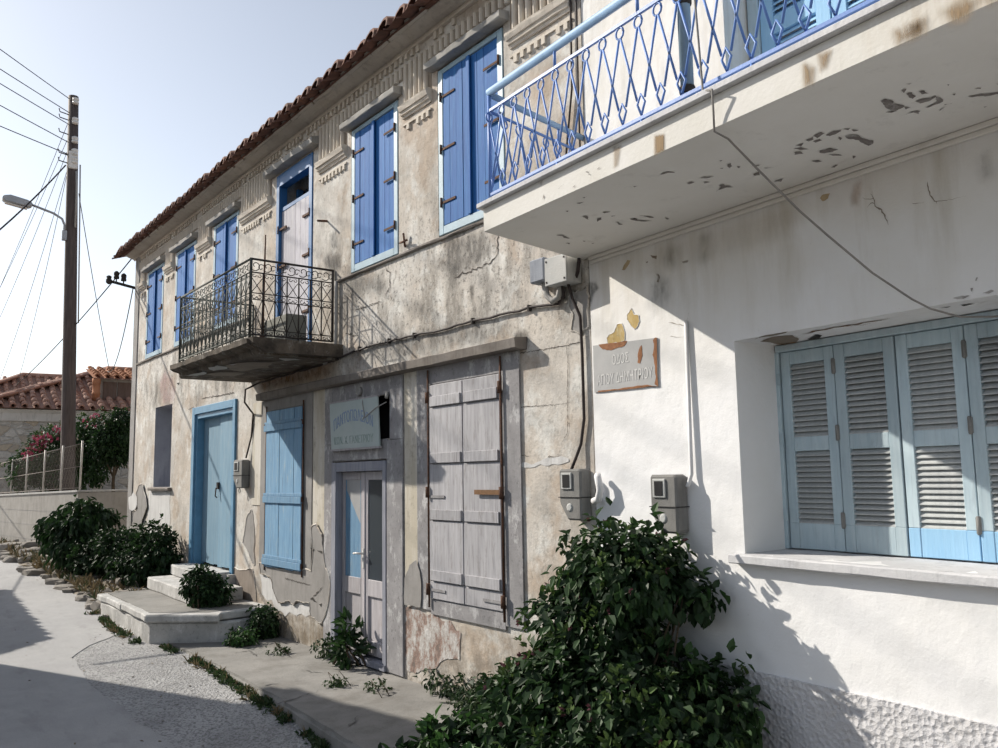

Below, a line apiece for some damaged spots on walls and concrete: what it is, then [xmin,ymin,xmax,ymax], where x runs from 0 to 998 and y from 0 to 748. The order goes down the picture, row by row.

peeling [881,83,955,114]
peeling [794,128,873,168]
peeling [606,308,640,343]
flaking render [233,508,331,624]
flaking render [404,560,461,673]